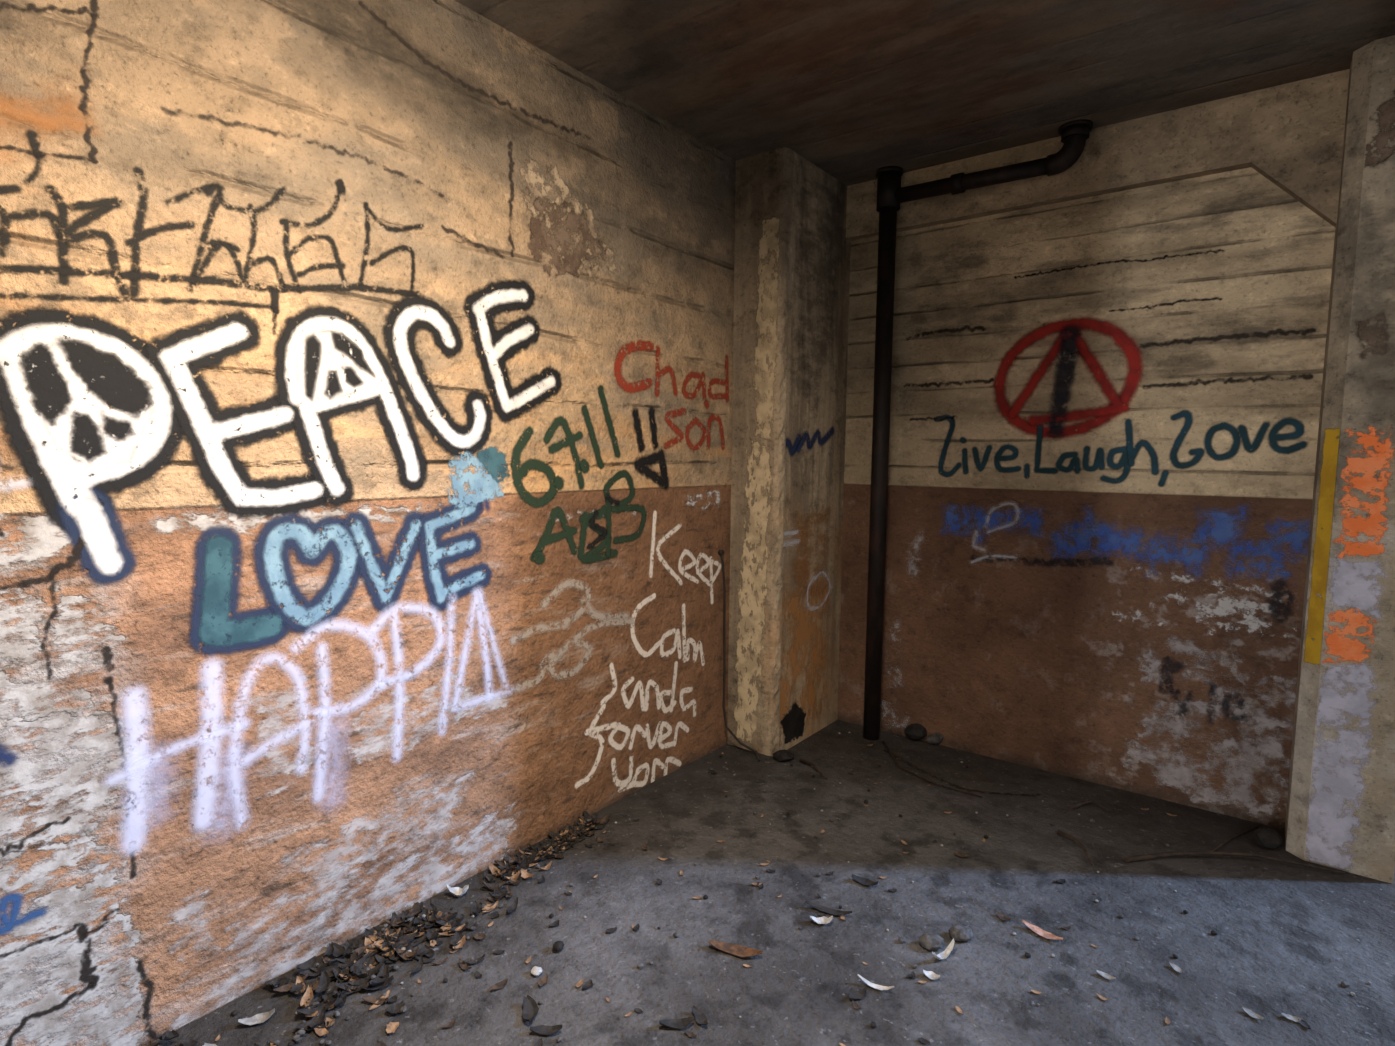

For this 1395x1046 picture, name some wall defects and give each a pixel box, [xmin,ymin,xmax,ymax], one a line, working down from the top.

crack [0,0,99,163]
spalling [520,157,616,279]
peeling [0,514,72,570]
crack [0,537,85,680]
peeling [155,503,442,533]
crack [0,817,71,856]
peeling [0,581,149,1046]
crack [103,646,137,878]
spalling [780,703,807,744]
peeling [1113,592,1296,817]
crack [0,908,119,1046]
crack [137,960,158,1040]